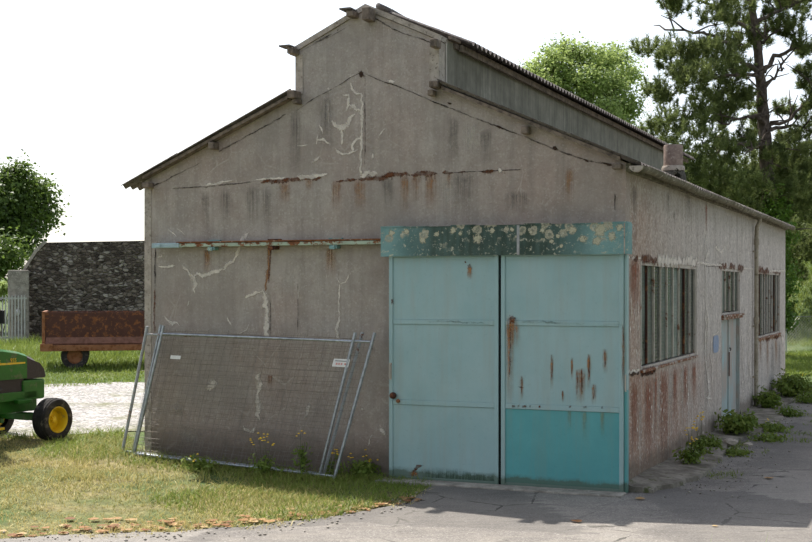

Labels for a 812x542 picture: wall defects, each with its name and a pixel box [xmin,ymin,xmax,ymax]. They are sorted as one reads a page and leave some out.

rust [261,177,321,193]
rust [336,168,520,195]
rust [629,253,657,289]
rust [507,316,517,375]
rust [571,354,594,399]
rust [642,365,696,430]